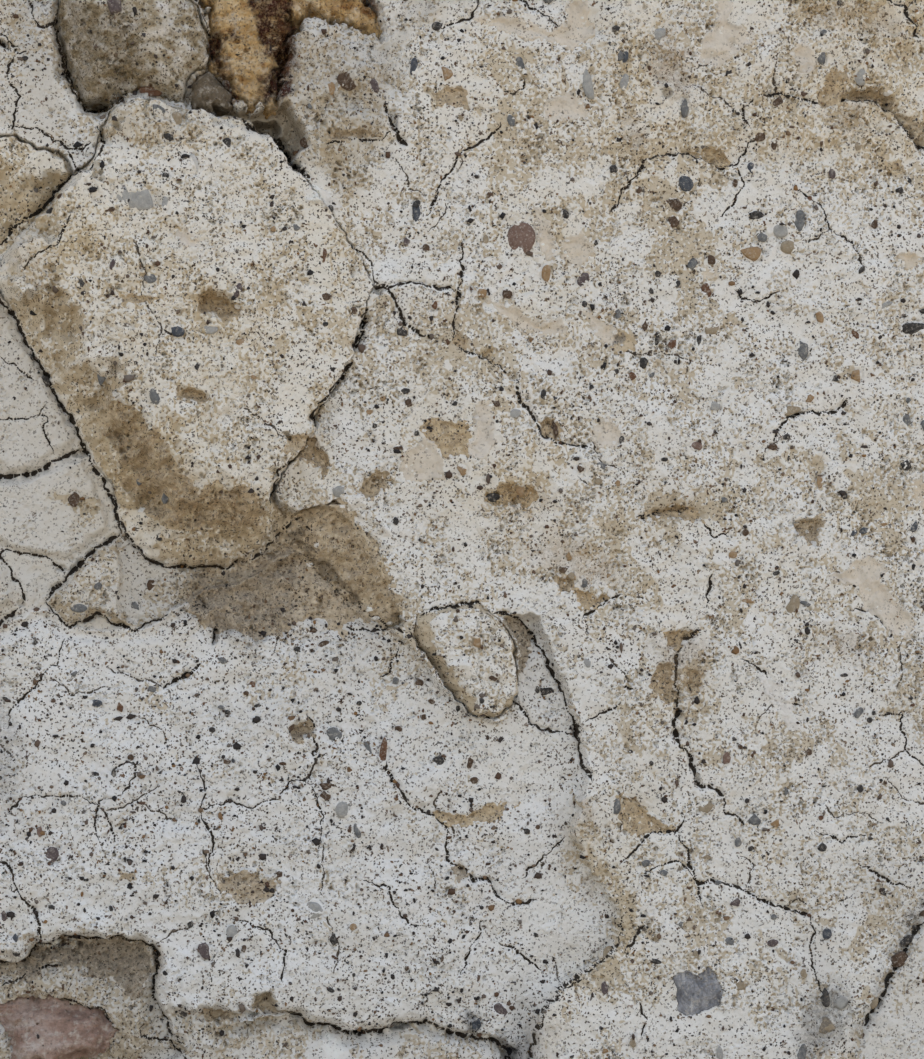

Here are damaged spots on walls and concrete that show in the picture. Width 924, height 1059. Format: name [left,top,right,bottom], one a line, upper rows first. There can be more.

crack [0,0,128,270]
spalling [327,126,384,143]
crack [309,241,626,485]
crack [0,298,633,781]
crack [672,571,744,826]
spalling [0,934,160,1000]
spalling [202,1008,231,1022]
crack [194,716,340,981]
peeling [320,1033,353,1059]
crack [287,915,645,1059]
crack [384,762,565,906]
crack [620,814,823,992]